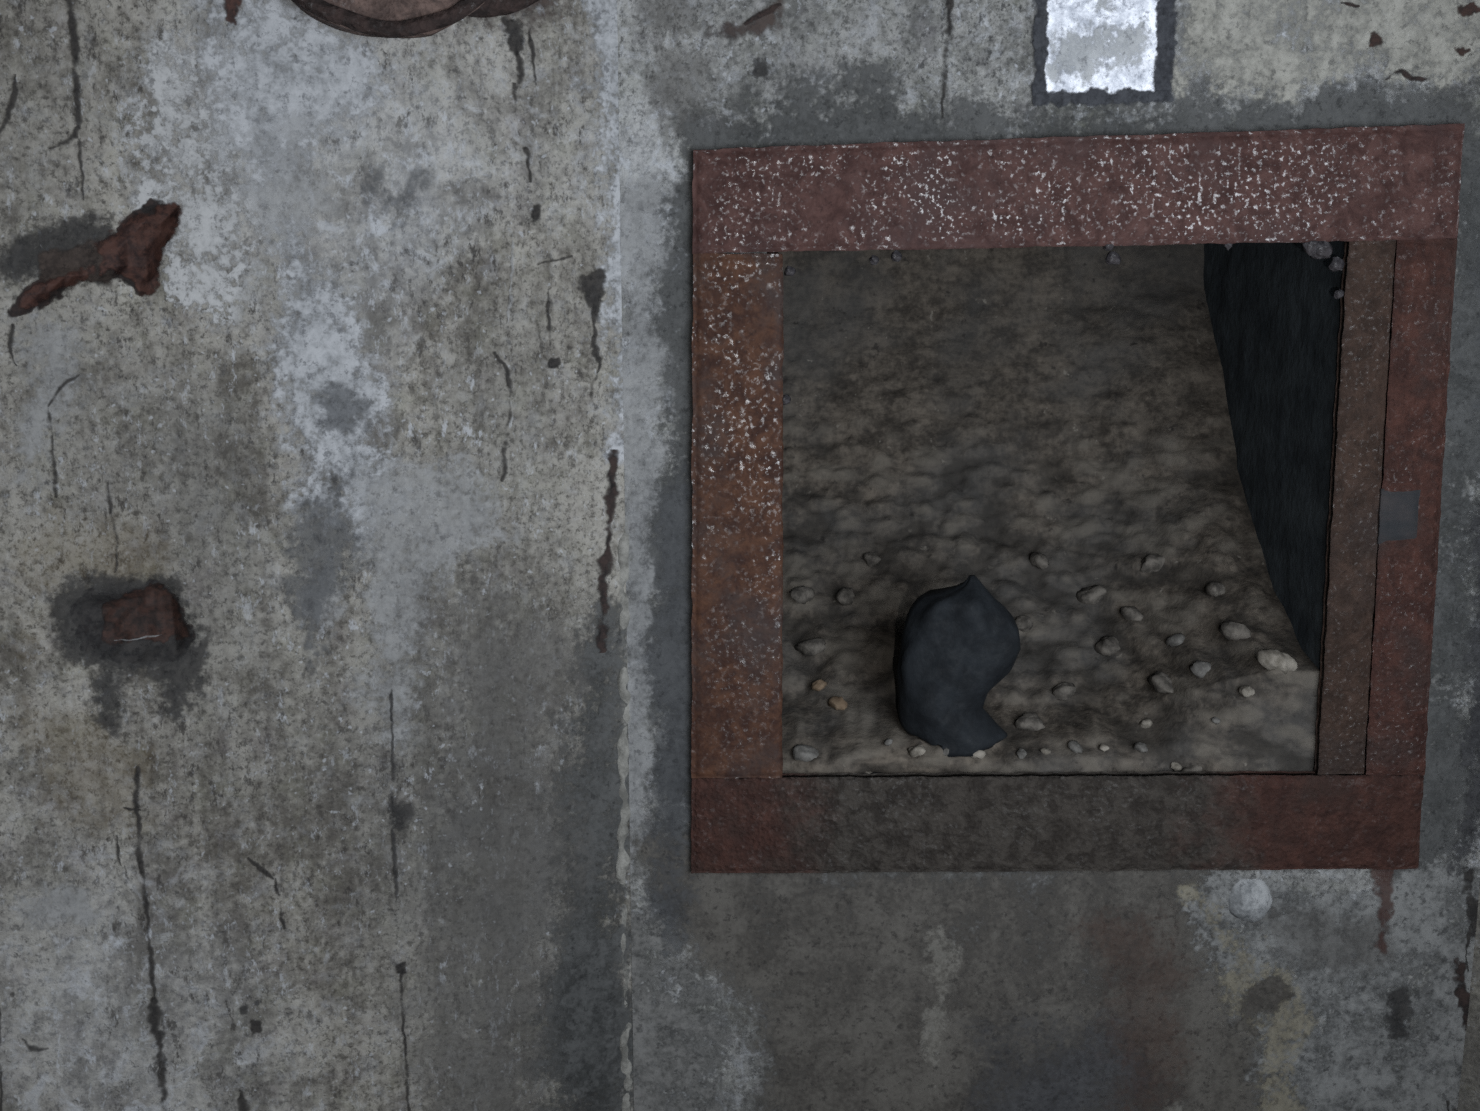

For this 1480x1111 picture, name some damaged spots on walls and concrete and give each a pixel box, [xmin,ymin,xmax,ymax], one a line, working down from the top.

leakage [525,0,1480,1111]